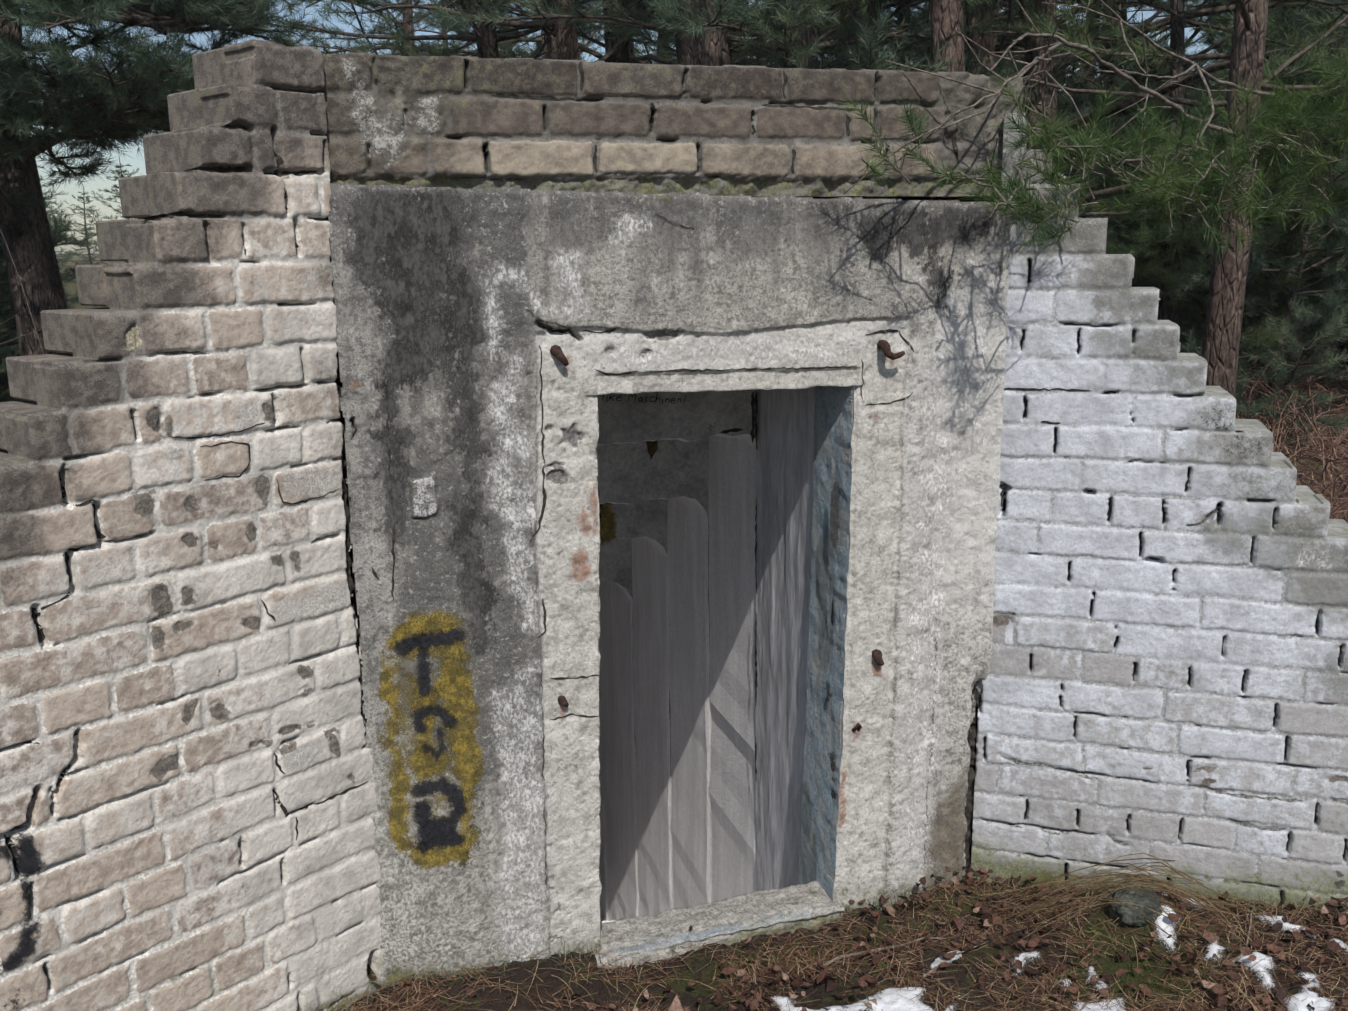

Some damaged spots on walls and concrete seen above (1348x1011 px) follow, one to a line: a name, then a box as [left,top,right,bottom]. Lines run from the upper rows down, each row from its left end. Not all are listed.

damp [329,187,587,655]
crack [525,308,620,542]
crack [595,329,914,450]
crack [3,731,78,869]
crack [31,472,106,643]
damp [459,668,548,962]
crack [538,599,547,638]
crack [541,670,599,899]
crack [752,502,760,781]
damp [844,201,998,887]
crack [924,617,938,864]
crack [964,681,1094,860]